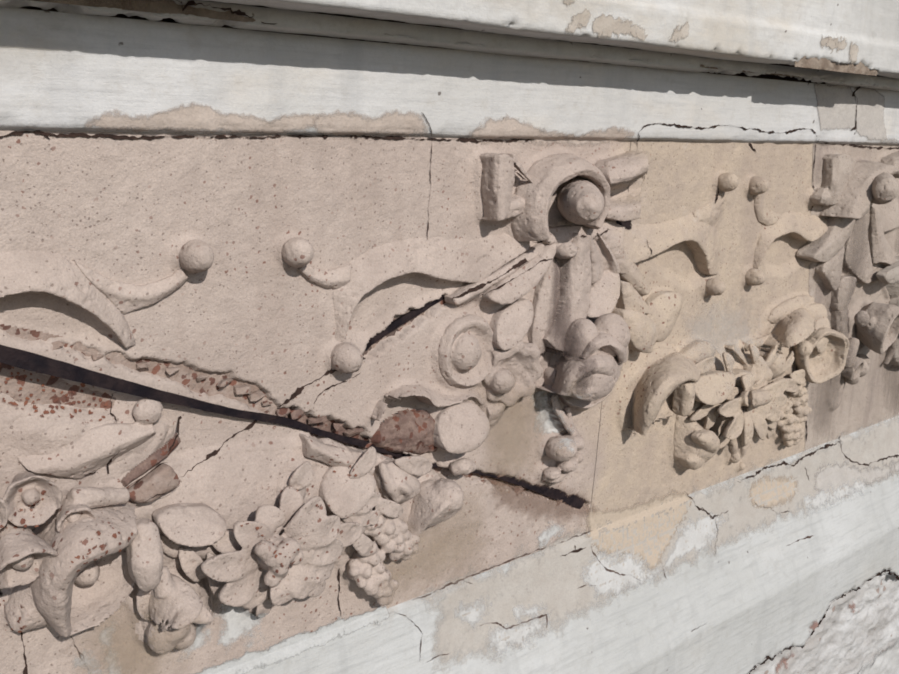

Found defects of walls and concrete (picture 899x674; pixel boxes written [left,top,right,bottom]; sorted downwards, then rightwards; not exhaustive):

peeling [563,0,648,43]
peeling [86,103,427,140]
crack [637,86,899,209]
crack [452,241,550,307]
crack [85,451,120,476]
crack [128,357,366,503]
crack [738,421,899,483]
crack [687,493,728,554]
crack [388,530,639,662]
crack [20,632,28,674]